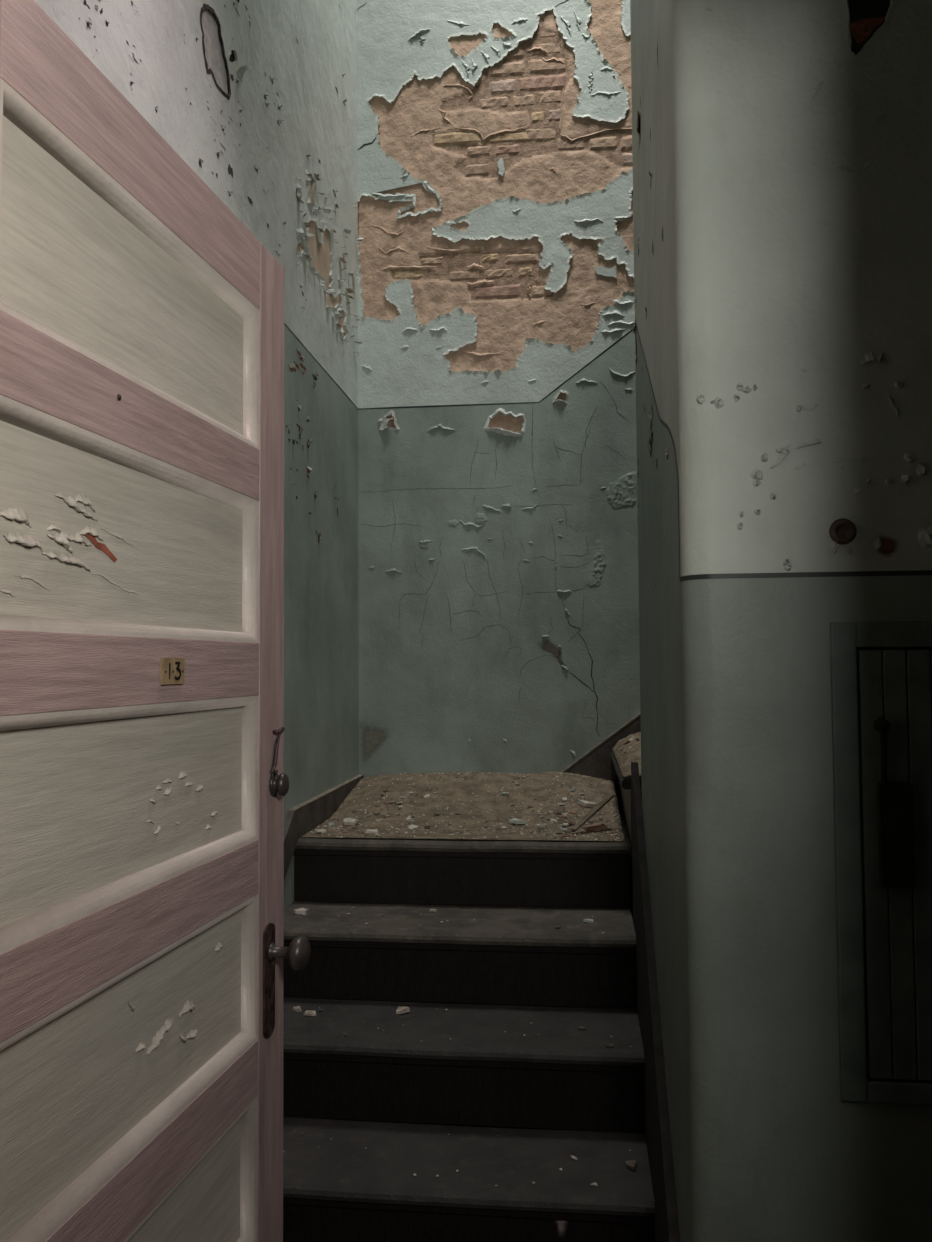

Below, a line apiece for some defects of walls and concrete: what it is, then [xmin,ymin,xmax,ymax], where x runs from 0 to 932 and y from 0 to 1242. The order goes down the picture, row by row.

peeling [79,0,138,52]
hole [841,0,896,60]
peeling [267,0,663,391]
peeling [377,410,400,431]
peeling [483,408,526,437]
peeling [600,405,668,521]
crack [361,382,629,735]